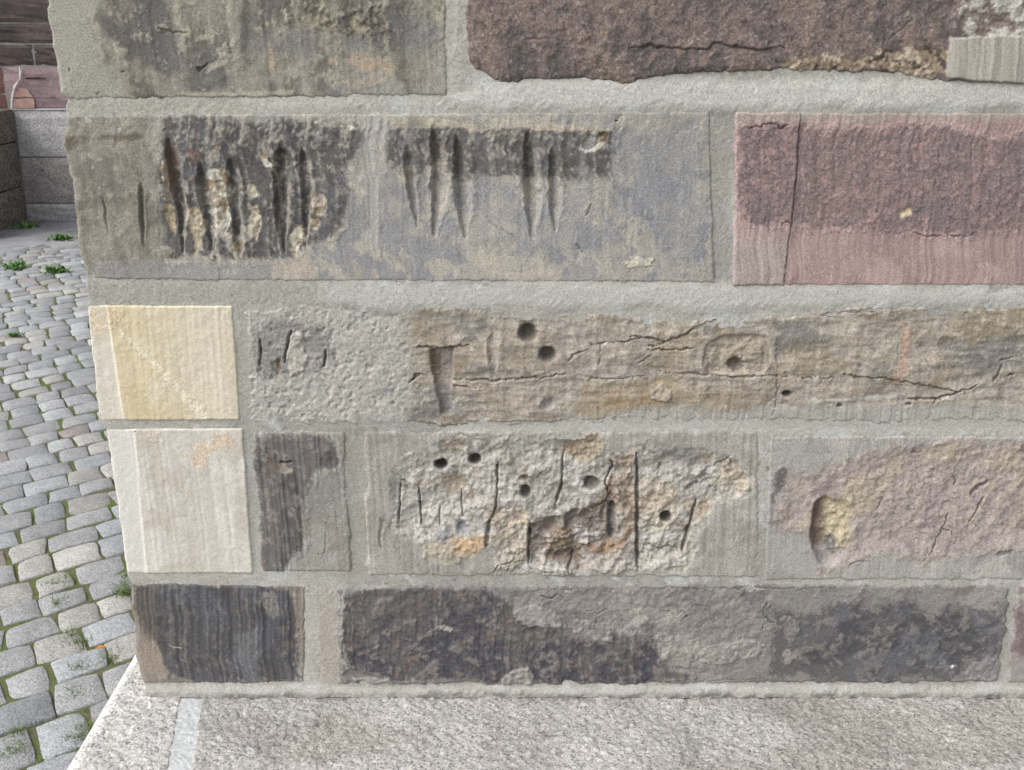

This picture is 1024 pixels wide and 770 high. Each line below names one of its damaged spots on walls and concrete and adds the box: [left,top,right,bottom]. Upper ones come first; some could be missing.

crack [624,39,787,54]
crack [745,113,804,285]
crack [455,417,586,425]
crack [406,332,1018,421]
spalling [385,422,801,677]
spalling [769,436,1024,577]